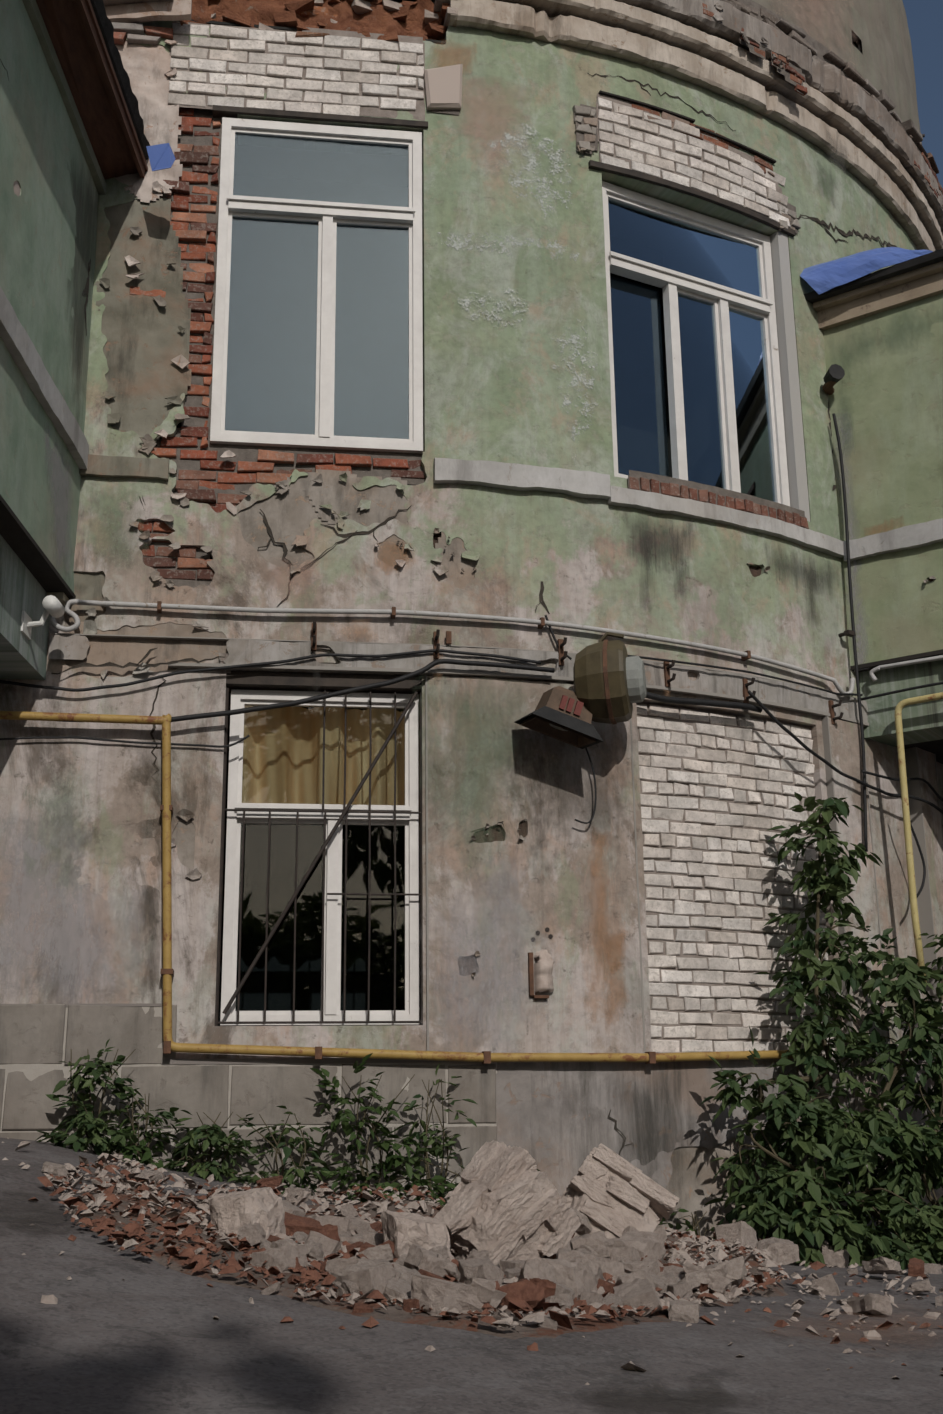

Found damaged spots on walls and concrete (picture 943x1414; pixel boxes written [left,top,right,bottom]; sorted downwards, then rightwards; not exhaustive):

spalling [739,28,808,96]
spalling [572,104,598,154]
crack [588,73,736,131]
spalling [775,200,801,234]
crack [797,214,897,247]
flaking render [94,39,426,588]
crack [257,506,411,605]
peeling [431,528,480,589]
hole [471,821,527,843]